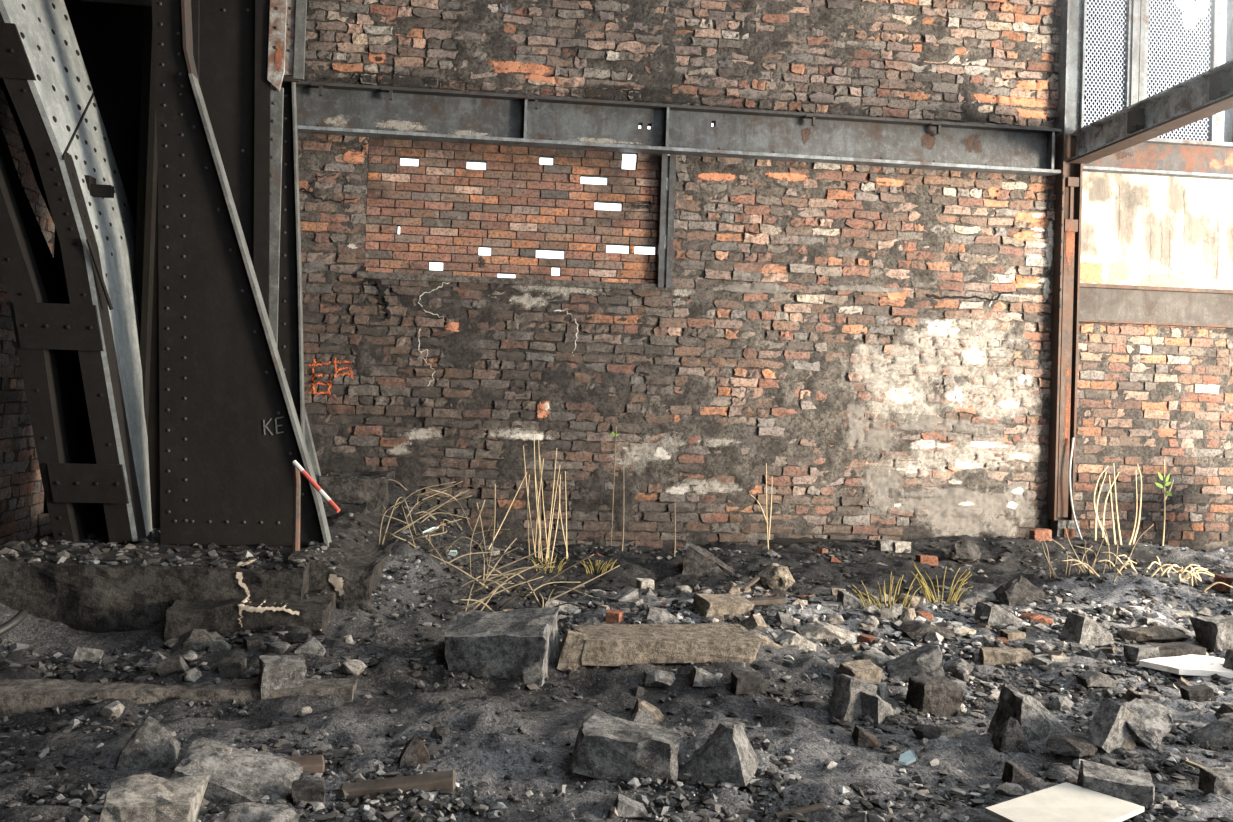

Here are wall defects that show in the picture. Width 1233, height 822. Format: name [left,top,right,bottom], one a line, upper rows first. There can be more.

peeling [1210,152,1233,169]
corrosion [1063,225,1075,264]
leakage [1081,225,1097,255]
leakage [1086,173,1233,282]
leakage [844,311,1046,485]